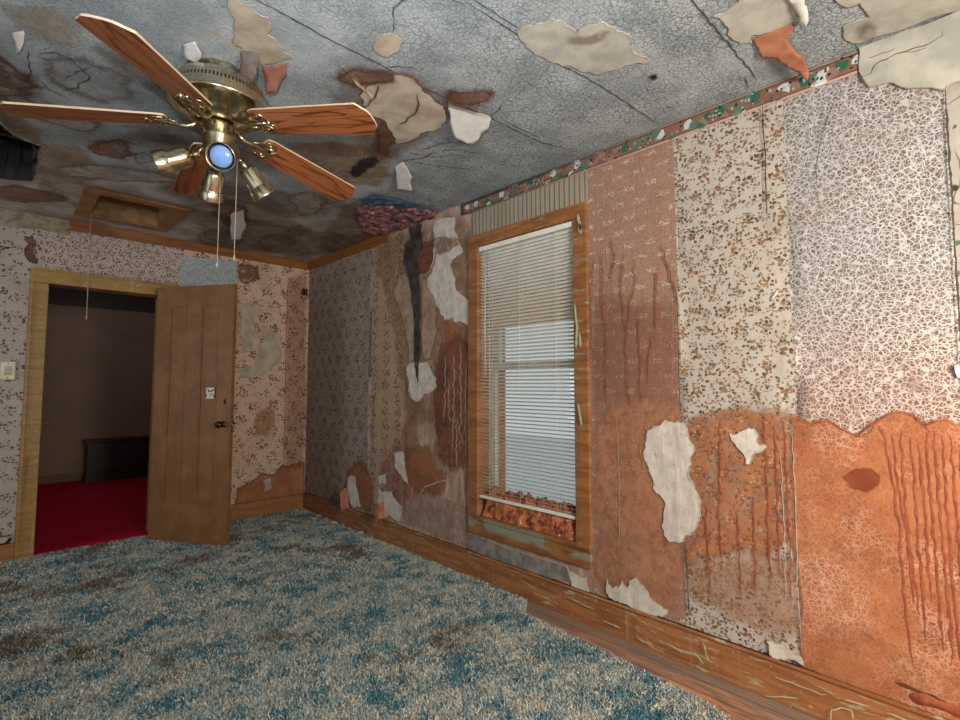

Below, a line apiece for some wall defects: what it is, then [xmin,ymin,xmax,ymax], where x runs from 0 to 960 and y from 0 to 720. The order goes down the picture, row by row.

leakage [0,56,176,203]
peeling [340,65,491,144]
crack [256,0,583,154]
crack [556,63,656,123]
crack [691,0,757,88]
peeling [712,0,809,81]
peeling [835,0,960,91]
peeling [418,217,468,325]
leakage [394,272,437,381]
leakage [796,411,958,438]
peeling [643,419,701,544]
leakage [752,414,802,646]